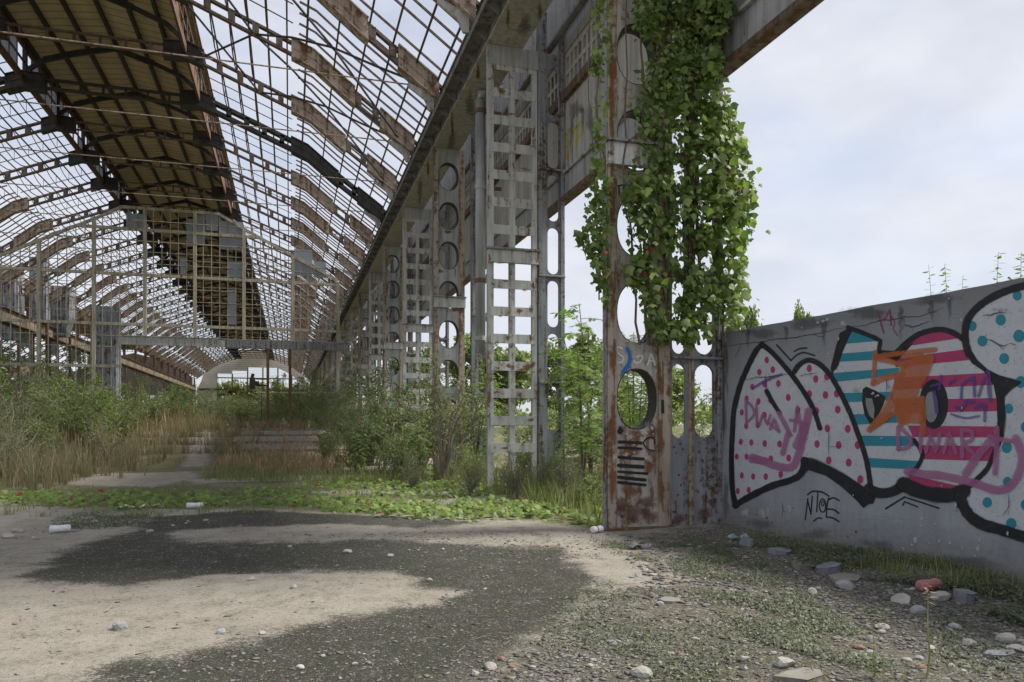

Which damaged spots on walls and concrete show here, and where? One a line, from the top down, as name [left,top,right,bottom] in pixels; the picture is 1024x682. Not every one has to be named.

rust [610,396,684,524]